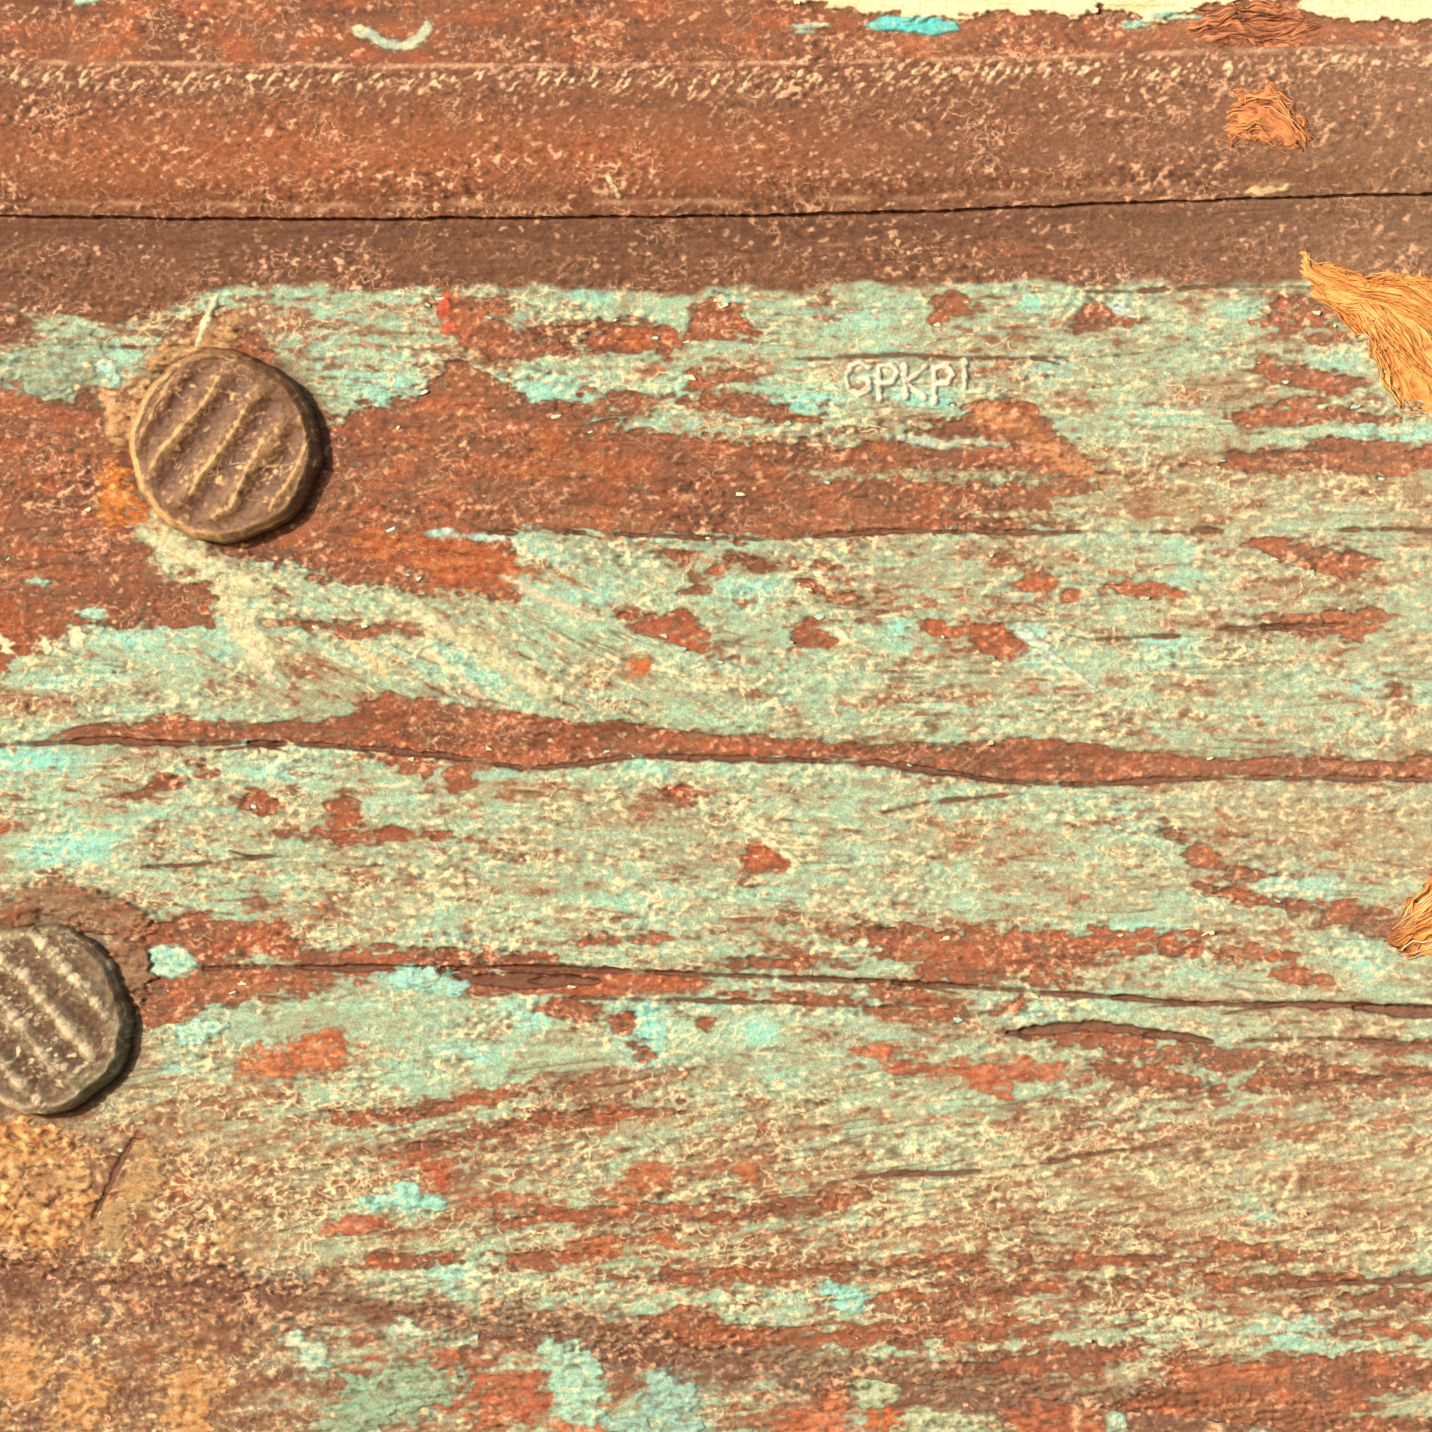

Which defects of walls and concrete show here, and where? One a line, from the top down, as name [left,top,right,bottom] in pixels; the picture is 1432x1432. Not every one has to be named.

peeling [0,0,1432,64]
peeling [0,328,225,673]
peeling [210,289,1102,664]
peeling [1215,354,1432,480]
peeling [228,787,487,848]
crack [0,736,1432,814]
peeling [50,690,1432,801]
peeling [1160,817,1401,939]
peeling [0,873,1432,1103]
crack [203,964,1432,1080]
peeling [537,1339,705,1432]
peeling [632,1234,1432,1432]